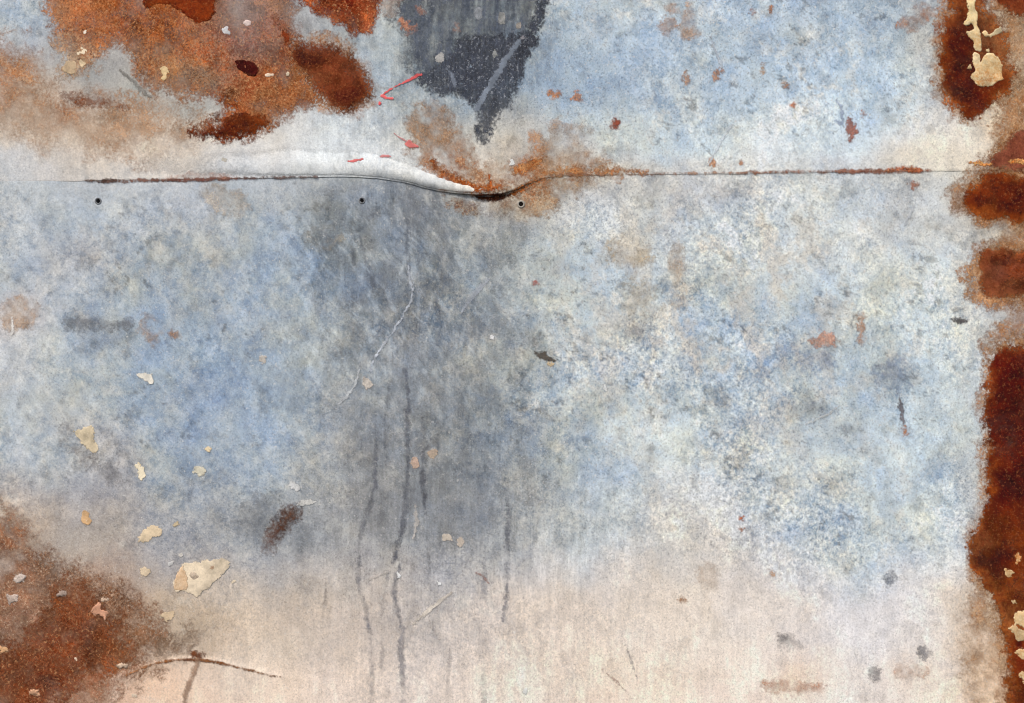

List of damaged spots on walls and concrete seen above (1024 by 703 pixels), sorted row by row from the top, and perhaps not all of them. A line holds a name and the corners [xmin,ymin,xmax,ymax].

rust [0,0,382,151]
rust [405,102,649,217]
rust [921,0,1024,703]
rust [0,513,175,703]
crack [126,651,276,703]
peeling [168,553,236,597]